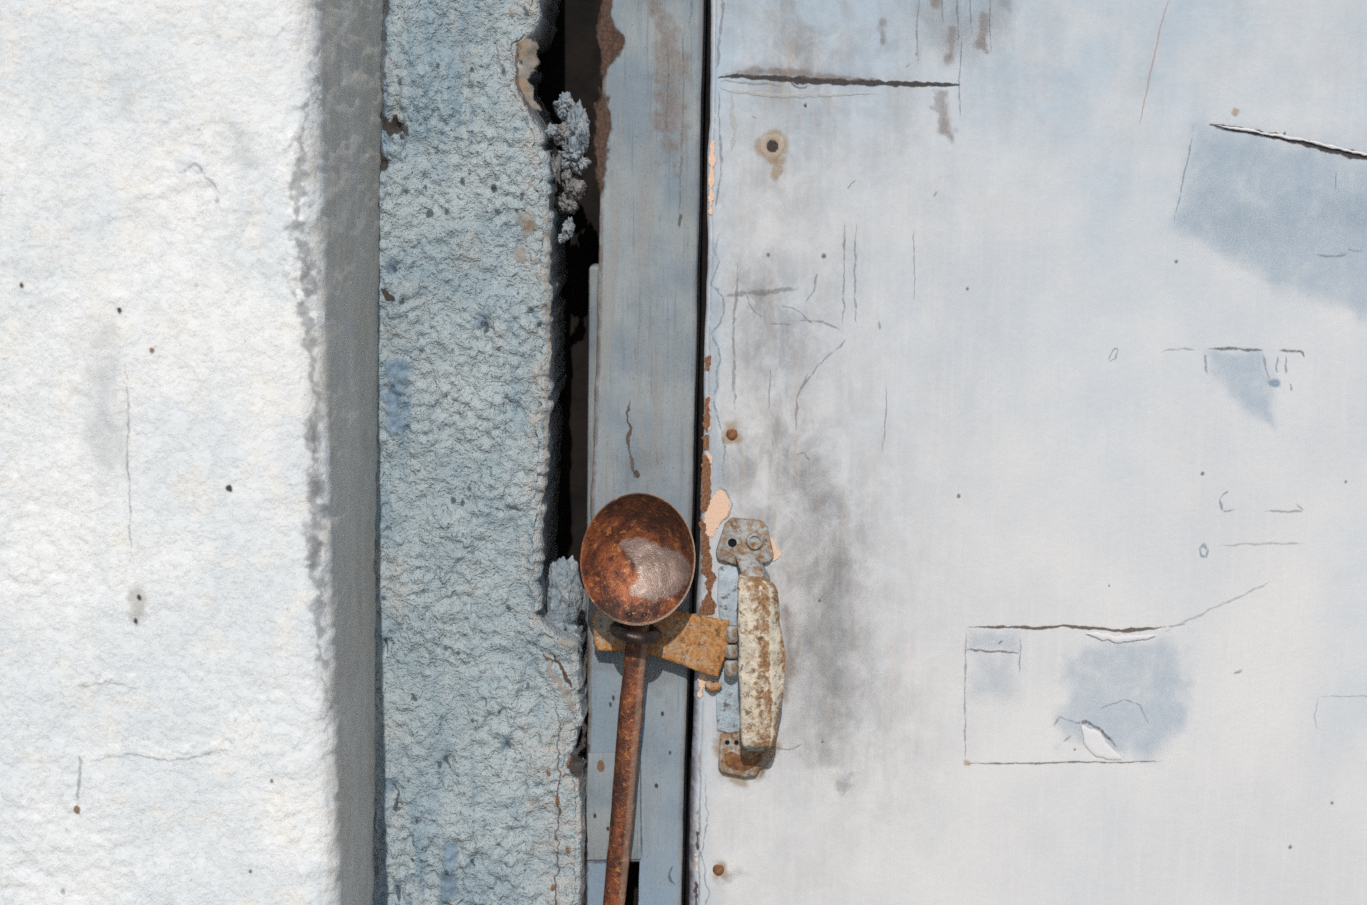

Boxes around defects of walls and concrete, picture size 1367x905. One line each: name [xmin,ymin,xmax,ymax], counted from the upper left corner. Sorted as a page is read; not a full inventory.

peeling [596,0,625,76]
crack [718,74,960,106]
peeling [1209,124,1367,159]
spalling [515,38,611,546]
peeling [972,624,1160,653]
peeling [982,720,1149,764]
rust [724,752,763,771]